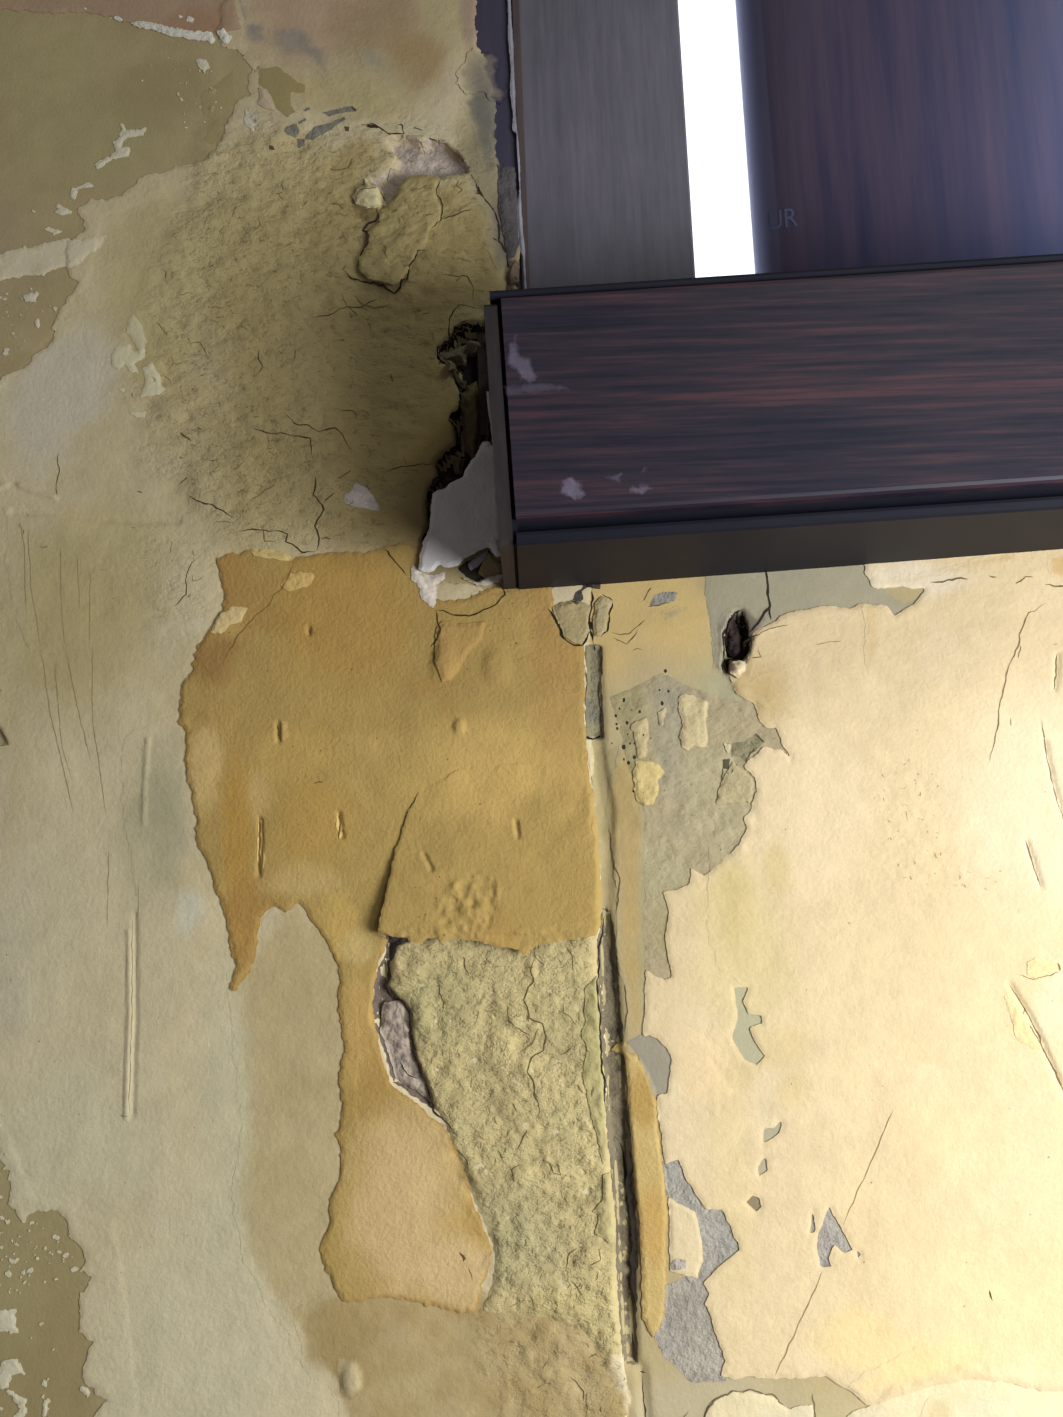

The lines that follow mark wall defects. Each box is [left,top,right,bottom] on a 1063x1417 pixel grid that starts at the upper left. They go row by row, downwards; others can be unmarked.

peeling [0,8,356,254]
peeling [0,267,79,380]
crack [152,175,510,665]
peeling [178,321,739,1383]
peeling [610,565,919,980]
peeling [0,1153,106,1417]
crack [379,958,469,1166]
crack [507,826,646,1417]
peeling [732,987,764,1065]
crack [684,1273,822,1417]
peeling [811,1207,860,1267]
crack [844,1114,892,1223]